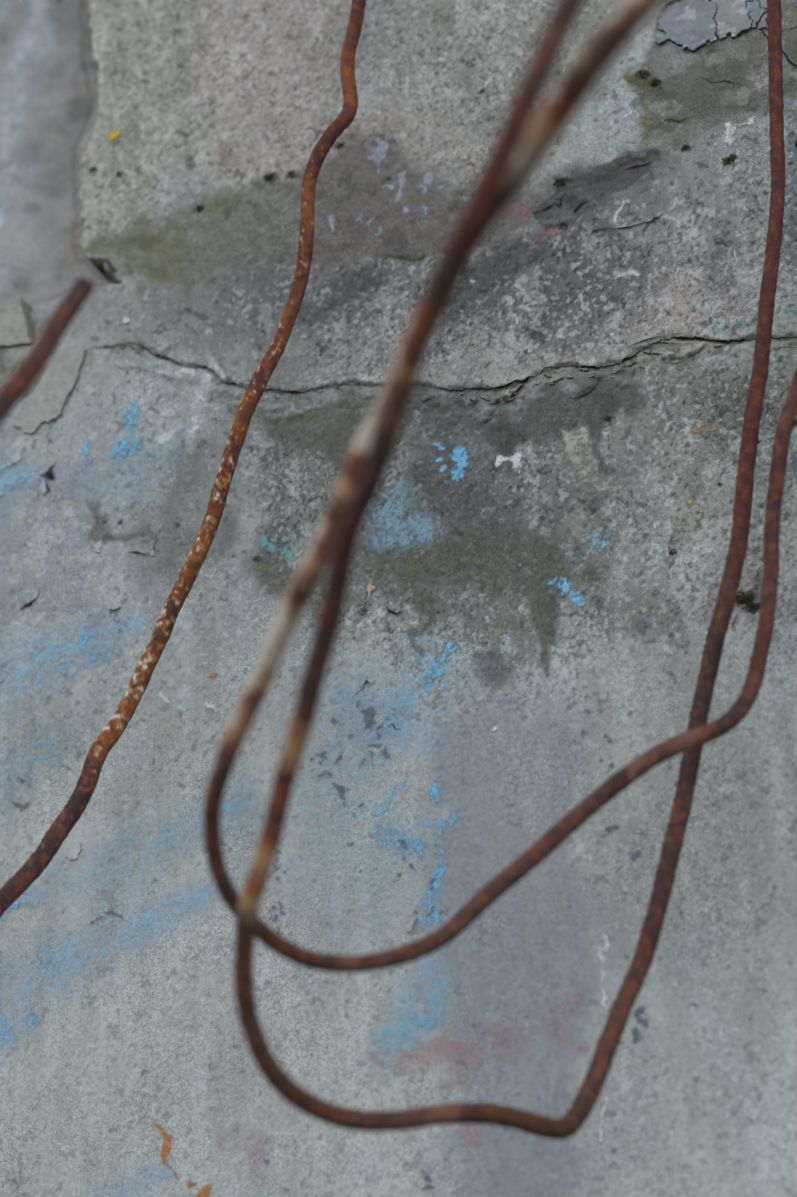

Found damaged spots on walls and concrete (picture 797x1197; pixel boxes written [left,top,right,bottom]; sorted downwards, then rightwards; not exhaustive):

crack [90,344,383,399]
crack [420,333,797,423]
spalling [0,0,366,918]
leakage [398,371,645,530]
spalling [203,0,797,1140]
leakage [522,585,558,672]
rust [156,1124,211,1197]